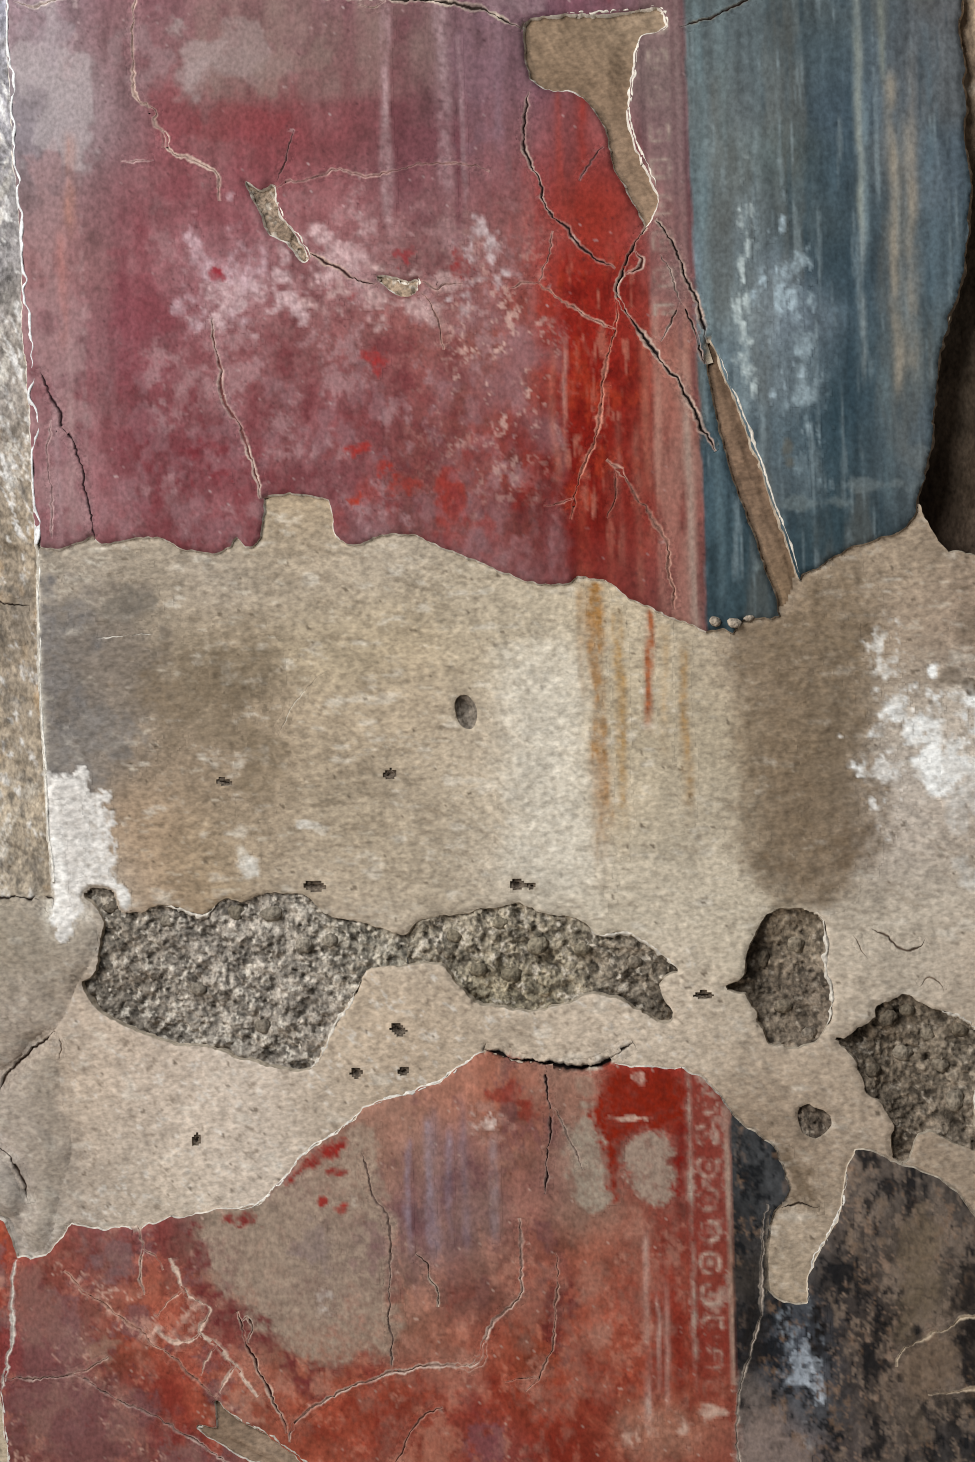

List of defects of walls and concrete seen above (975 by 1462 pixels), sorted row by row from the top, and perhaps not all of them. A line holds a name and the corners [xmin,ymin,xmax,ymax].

crack [120,0,226,201]
crack [34,366,100,541]
crack [204,318,271,500]
spalling [6,0,678,1070]
crack [272,91,720,610]
spalling [707,343,798,606]
corrosion [572,578,699,862]
damp [709,554,975,919]
crack [0,1026,638,1462]
peeling [178,1054,477,1403]
peeling [559,1066,692,1217]
spalling [728,908,975,1161]